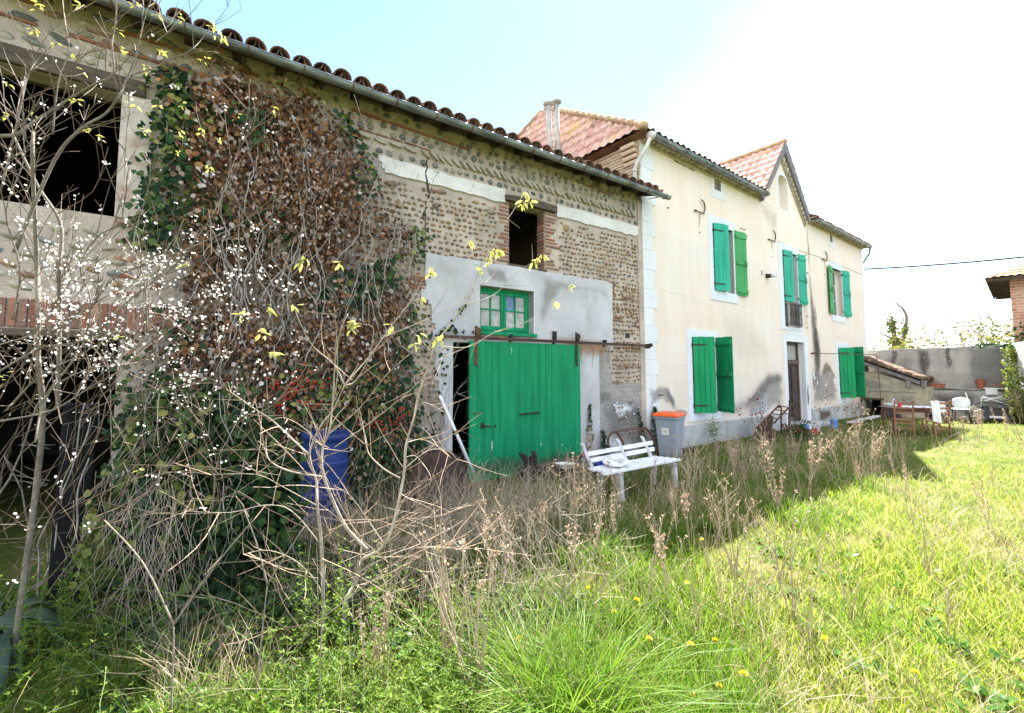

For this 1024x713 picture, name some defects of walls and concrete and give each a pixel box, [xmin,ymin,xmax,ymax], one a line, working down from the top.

damp [811,298,834,399]
damp [920,352,928,372]
damp [651,389,682,425]
damp [746,377,781,414]